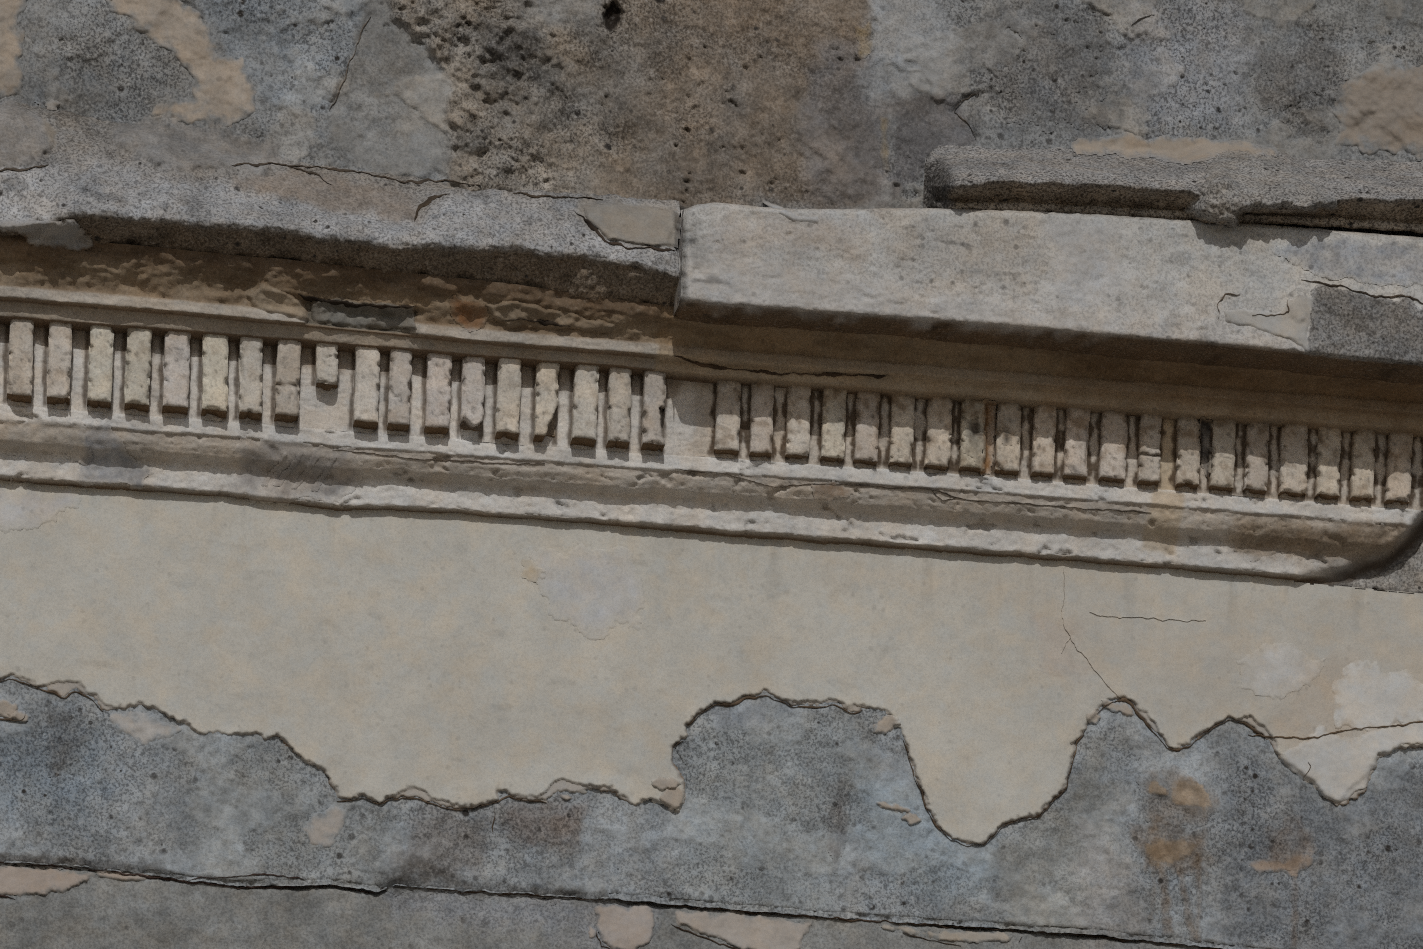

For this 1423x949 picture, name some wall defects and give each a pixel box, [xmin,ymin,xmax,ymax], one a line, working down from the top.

flaking render [0,0,61,110]
flaking render [106,0,257,127]
crack [233,162,676,251]
flaking render [761,198,819,224]
crack [1217,279,1423,318]
crack [903,571,1423,845]
spalling [0,657,1423,949]
crack [0,862,1219,949]